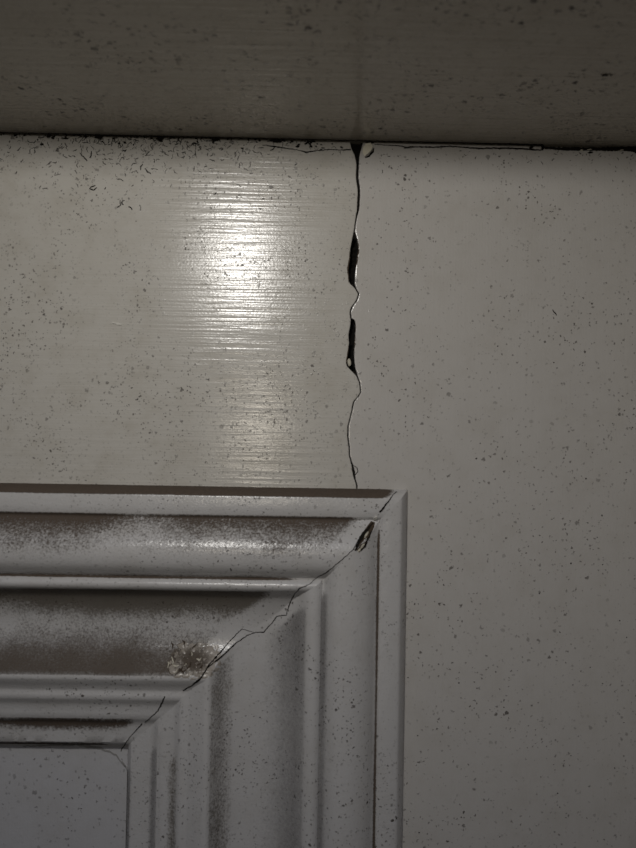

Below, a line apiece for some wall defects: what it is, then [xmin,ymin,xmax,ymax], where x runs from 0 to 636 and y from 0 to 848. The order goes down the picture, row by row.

crack [0,132,636,488]
crack [23,491,397,770]